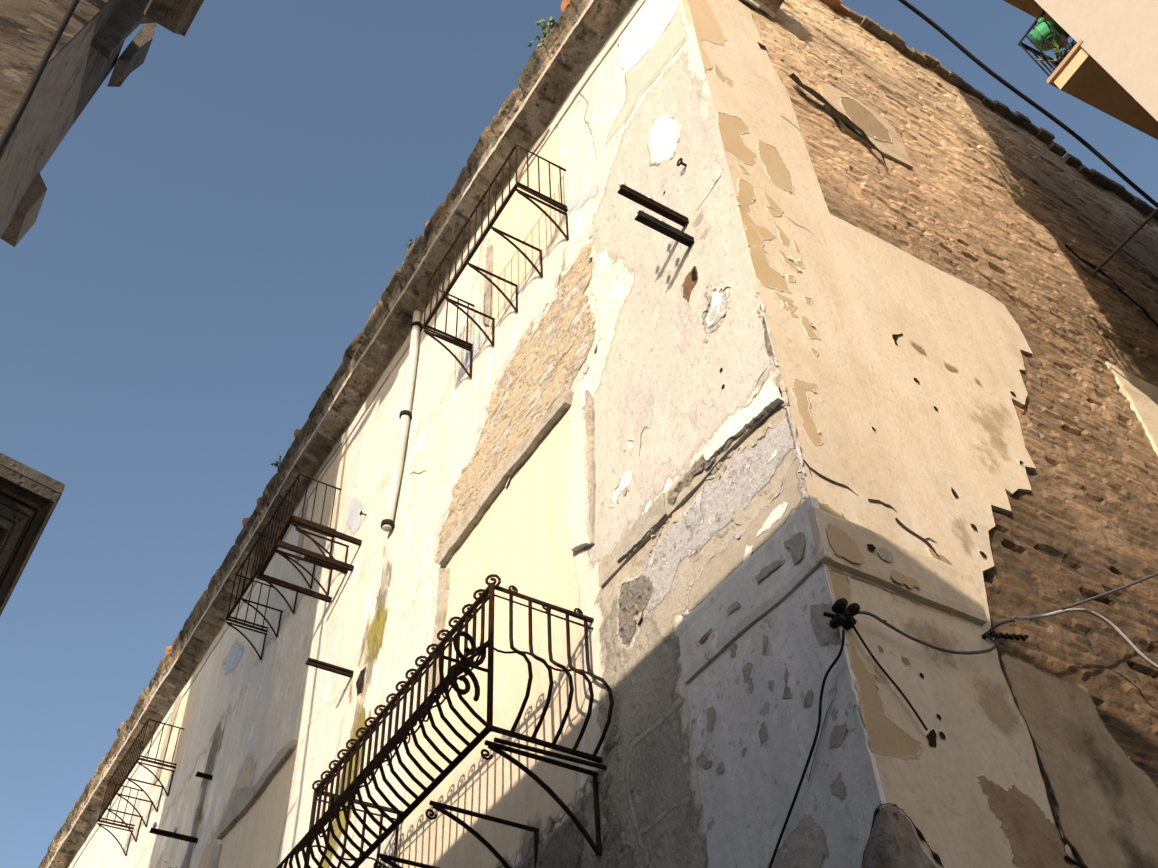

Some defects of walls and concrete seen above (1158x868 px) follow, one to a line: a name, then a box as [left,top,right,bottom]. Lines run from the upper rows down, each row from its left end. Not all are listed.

crack [789,73,886,164]
peeling [839,96,892,143]
peeling [680,264,733,344]
peeling [716,111,821,366]
crack [1065,243,1158,328]
peeling [434,221,602,562]
crack [803,459,940,558]
damp [376,562,391,612]
peeling [609,378,946,760]
peeling [927,548,955,567]
damp [349,620,375,746]
peeling [976,774,1075,868]